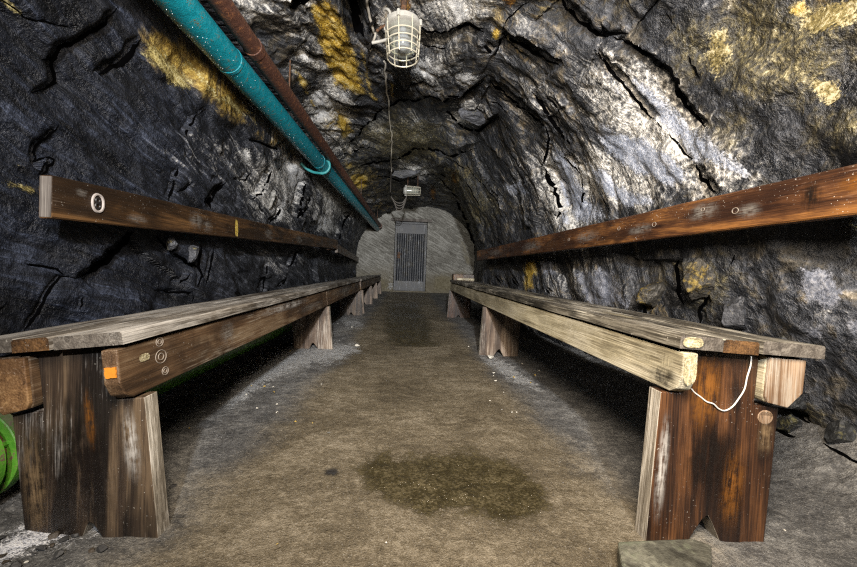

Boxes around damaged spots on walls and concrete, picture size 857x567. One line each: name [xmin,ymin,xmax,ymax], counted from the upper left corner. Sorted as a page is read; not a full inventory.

damp [352,446,553,525]